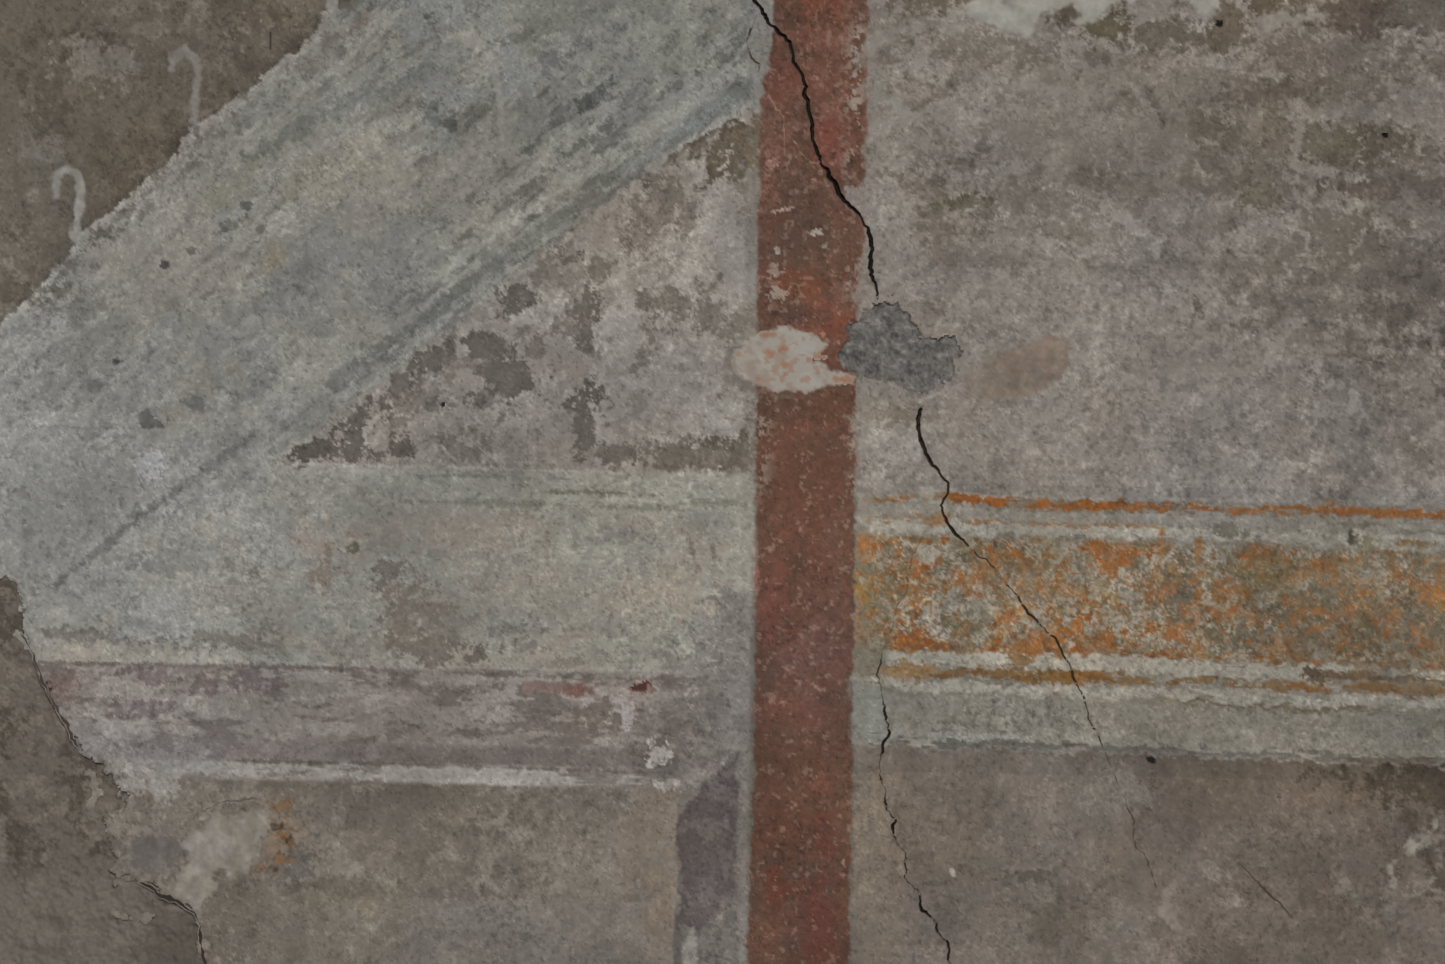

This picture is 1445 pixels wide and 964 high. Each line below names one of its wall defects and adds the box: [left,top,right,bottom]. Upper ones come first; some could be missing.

crack [744,0,882,301]
spalling [731,291,1072,404]
crack [863,404,1160,964]
leakage [1385,814,1445,900]